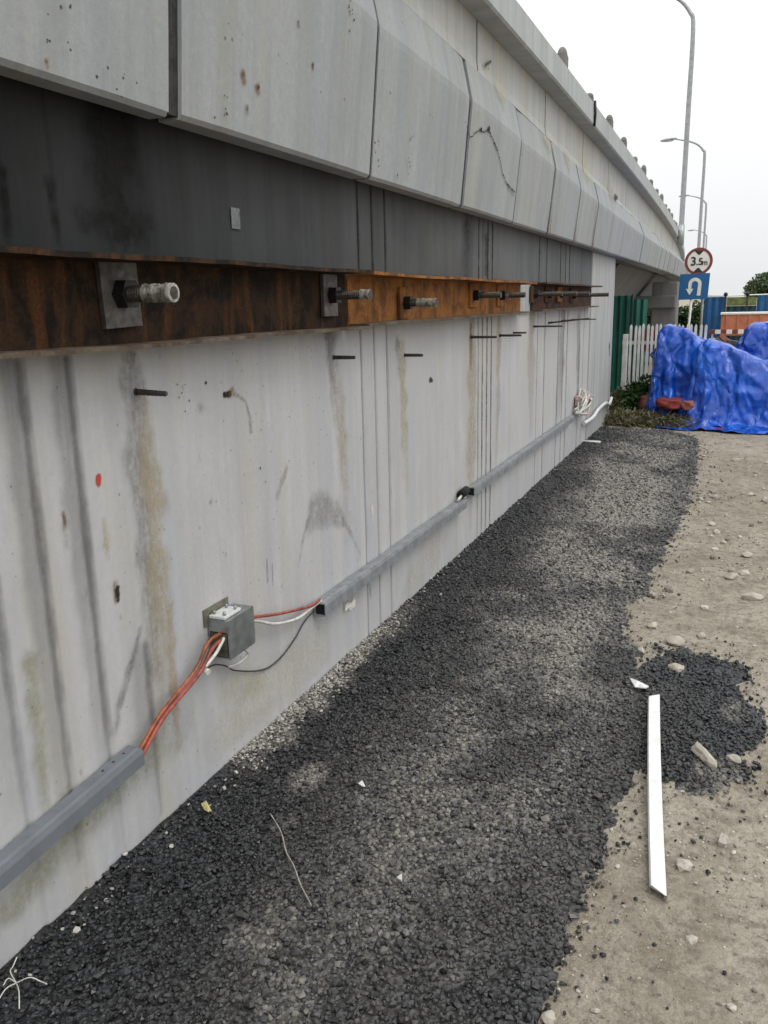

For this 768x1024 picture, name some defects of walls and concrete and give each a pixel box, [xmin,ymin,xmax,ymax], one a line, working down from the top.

crack [467,128,515,195]